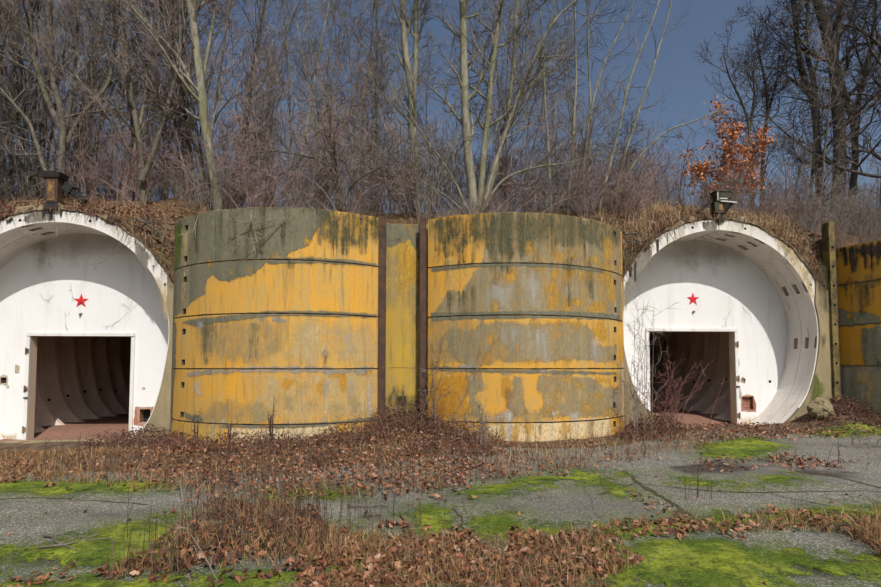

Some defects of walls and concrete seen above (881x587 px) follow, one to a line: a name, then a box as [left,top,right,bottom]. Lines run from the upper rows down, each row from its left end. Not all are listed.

peeling [160,207,333,431]
peeling [428,212,652,418]
peeling [838,308,881,425]
crack [600,470,881,519]